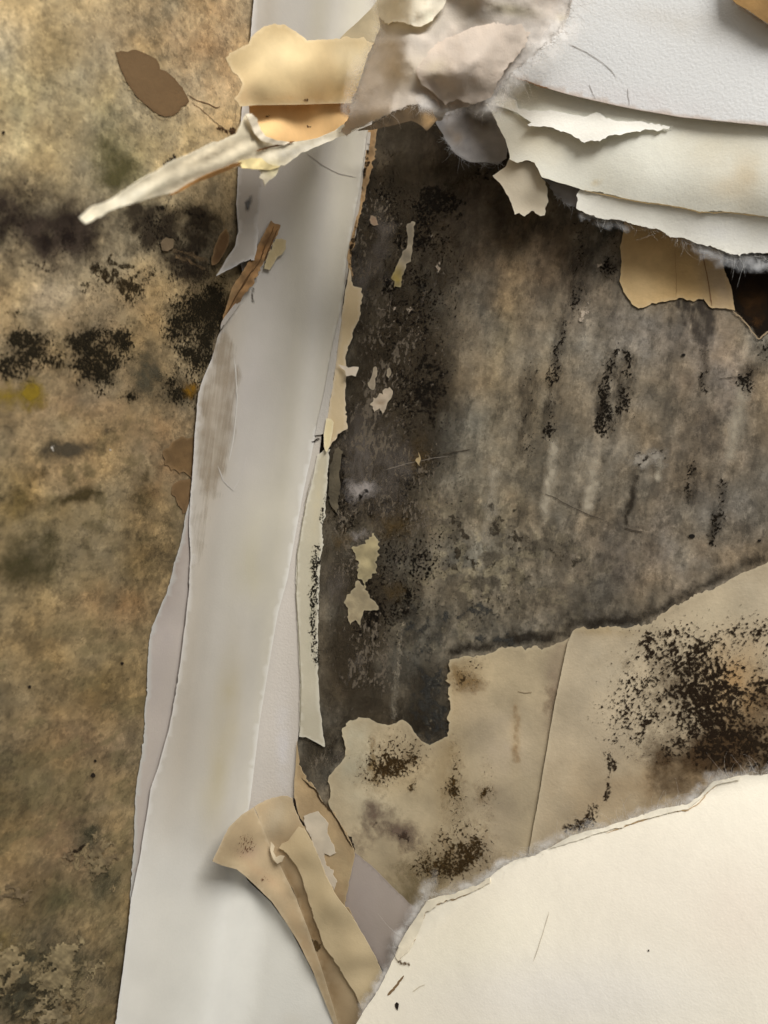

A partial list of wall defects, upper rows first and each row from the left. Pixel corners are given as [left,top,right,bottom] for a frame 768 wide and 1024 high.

peeling [115,50,189,120]
leakage [0,178,228,413]
peeling [161,237,174,251]
leakage [304,122,496,792]
leakage [524,322,567,513]
leakage [592,342,635,438]
leakage [625,450,666,523]
leakage [677,299,715,392]
leakage [724,252,768,356]
leakage [504,632,554,646]
leakage [562,591,768,833]
leakage [367,751,494,885]